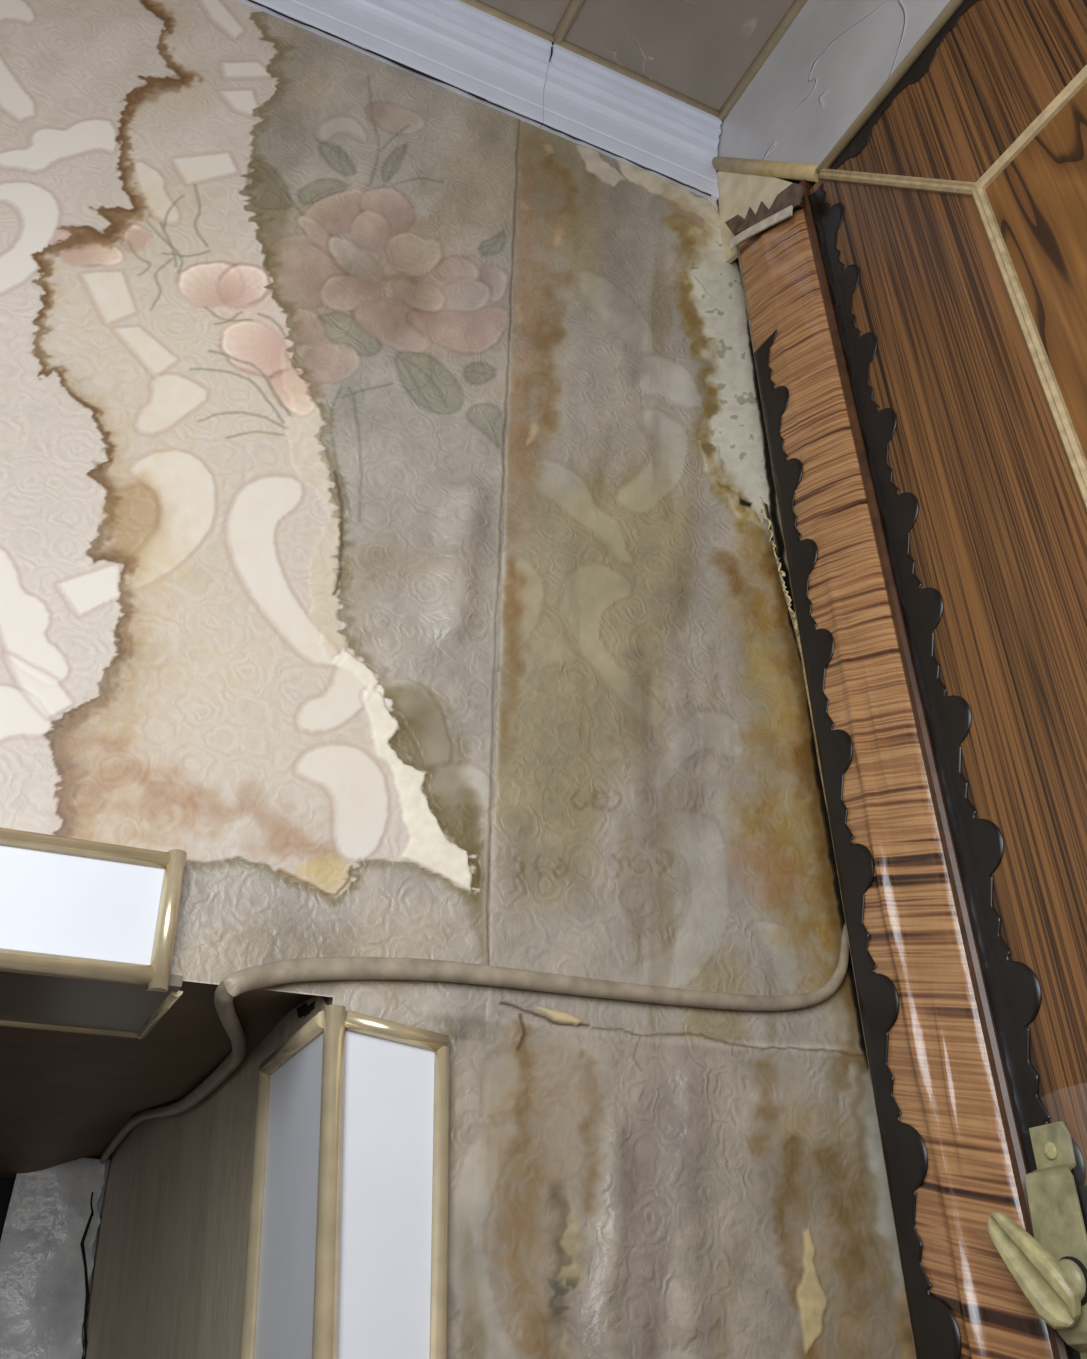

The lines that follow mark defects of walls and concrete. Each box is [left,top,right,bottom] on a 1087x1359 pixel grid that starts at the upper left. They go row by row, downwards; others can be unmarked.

flaking render [575,144,768,530]
peeling [279,344,380,691]
damp [28,0,849,1359]
crack [80,1192,94,1359]
peeling [794,1227,830,1355]